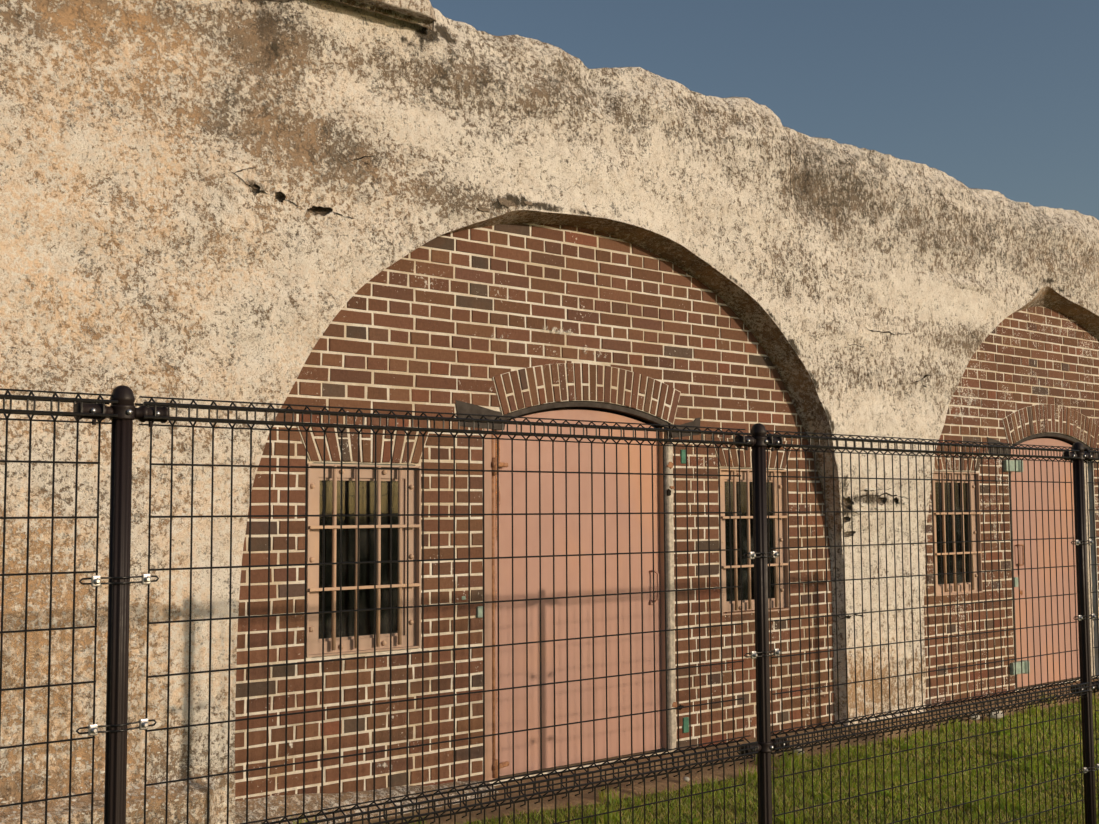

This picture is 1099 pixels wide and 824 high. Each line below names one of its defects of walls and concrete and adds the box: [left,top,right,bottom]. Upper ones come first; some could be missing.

spalling [307,206,333,216]
spalling [840,488,908,537]